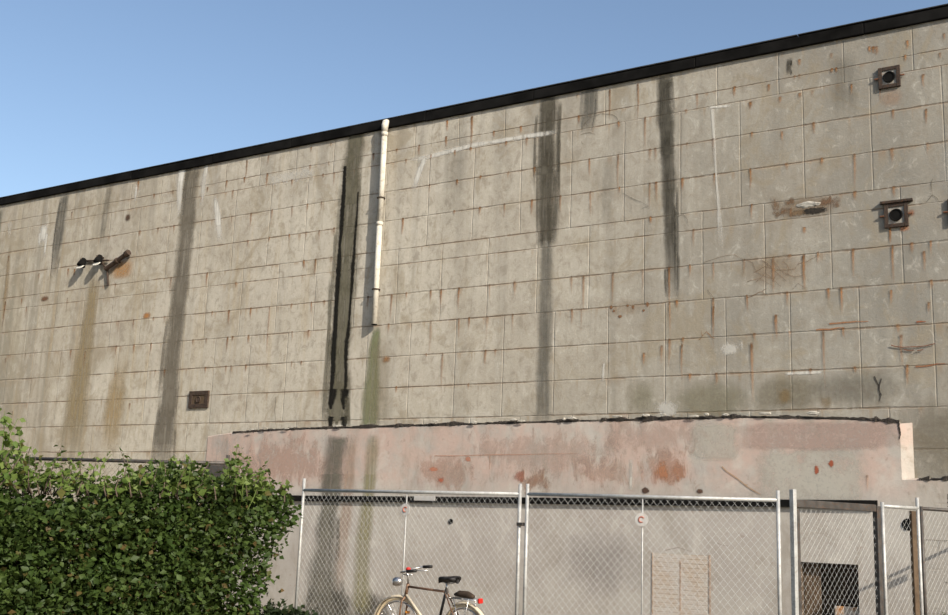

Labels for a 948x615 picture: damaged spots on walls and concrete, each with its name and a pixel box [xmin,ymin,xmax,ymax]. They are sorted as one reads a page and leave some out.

water stain [157,165,208,453]
water stain [325,134,363,427]
water stain [414,97,561,406]
water stain [658,77,678,287]
spalling [774,197,839,216]
water stain [308,438,385,615]